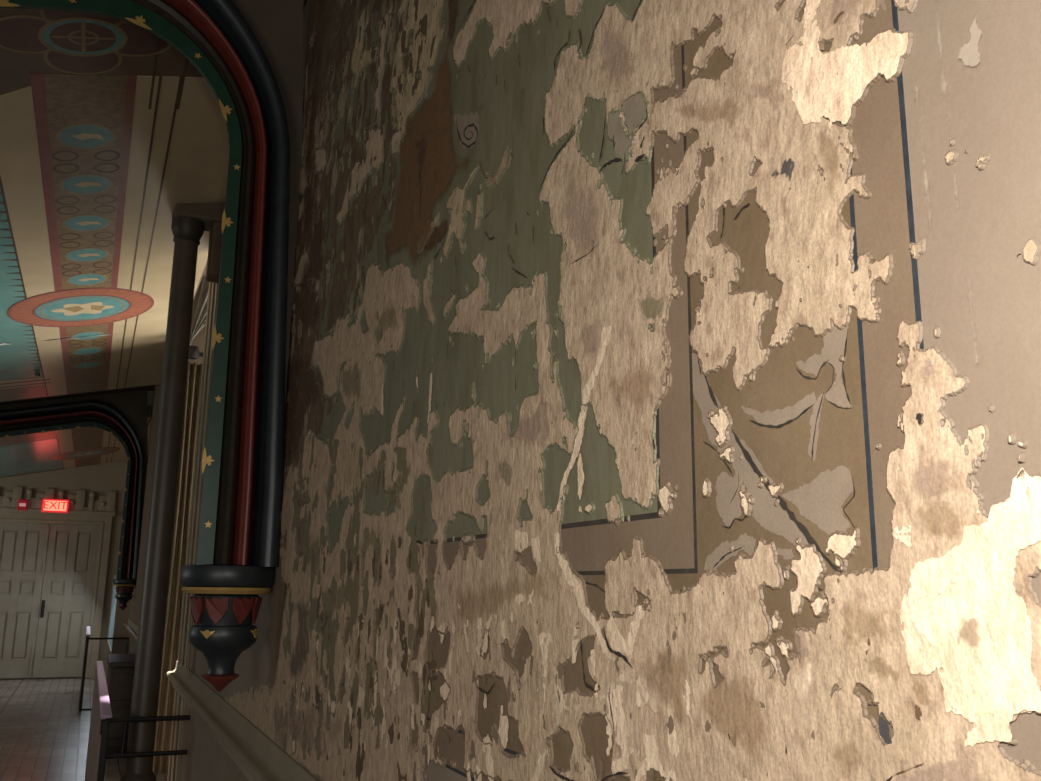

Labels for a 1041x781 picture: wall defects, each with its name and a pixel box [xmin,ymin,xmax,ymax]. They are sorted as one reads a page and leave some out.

peeling [222,0,1041,781]